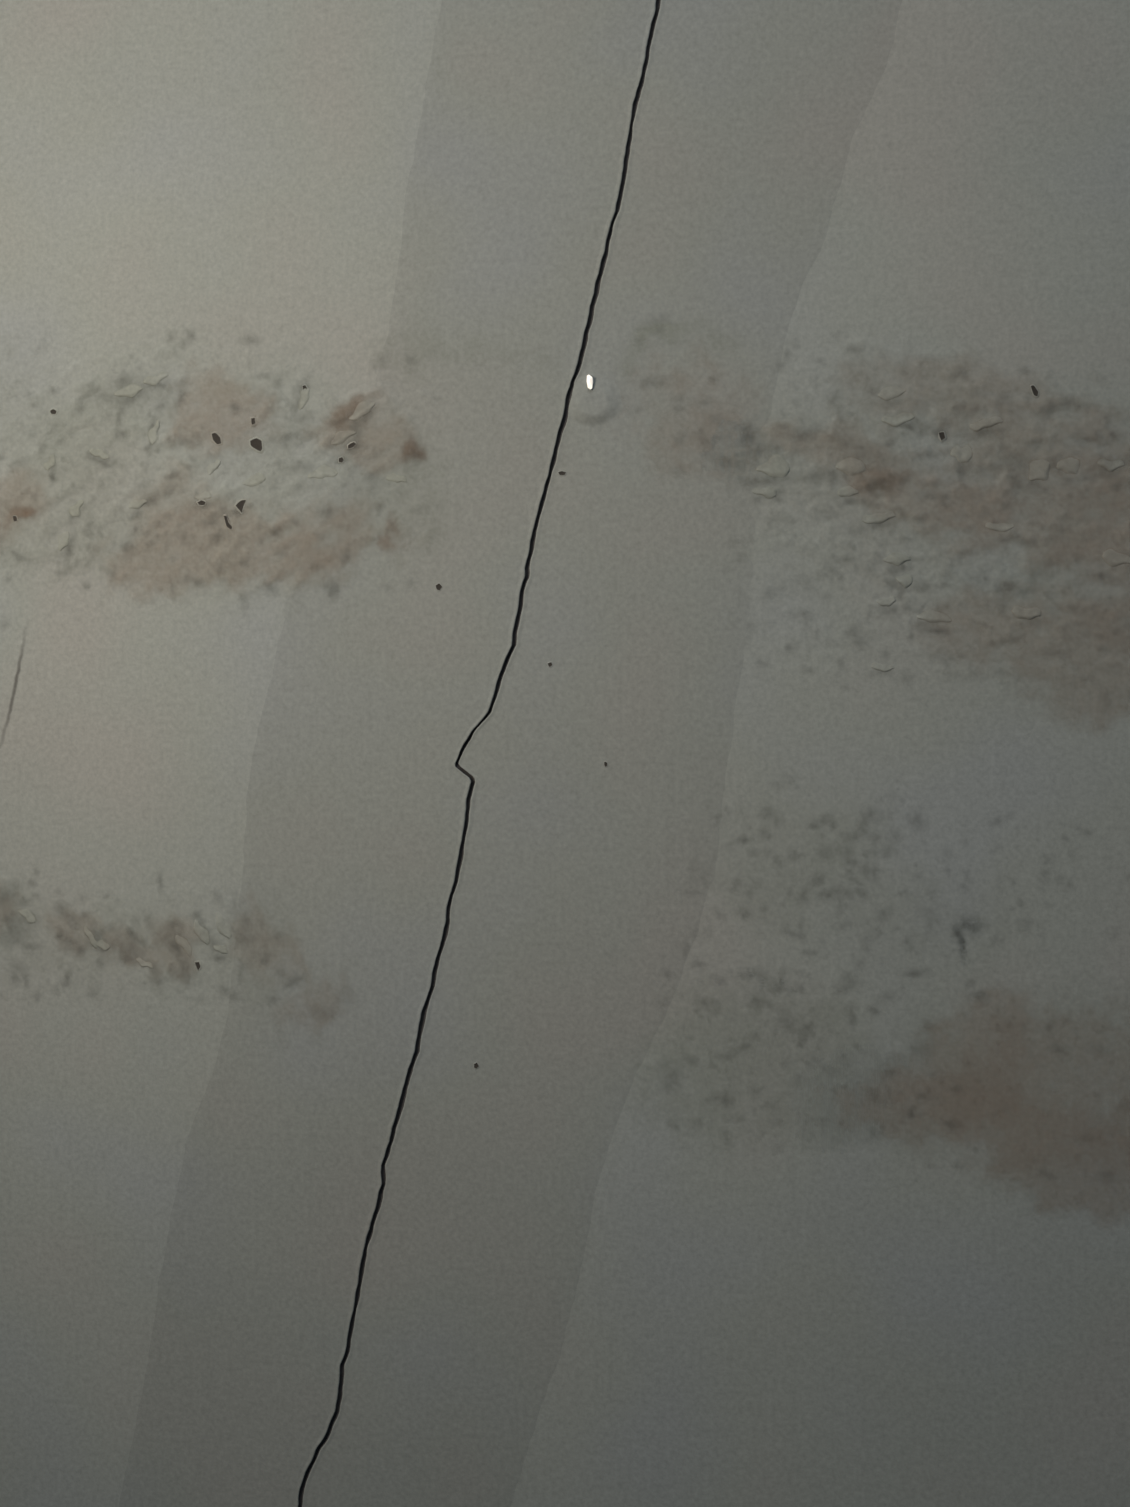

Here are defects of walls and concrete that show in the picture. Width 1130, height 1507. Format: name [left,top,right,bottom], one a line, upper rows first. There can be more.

crack [294,0,666,1507]